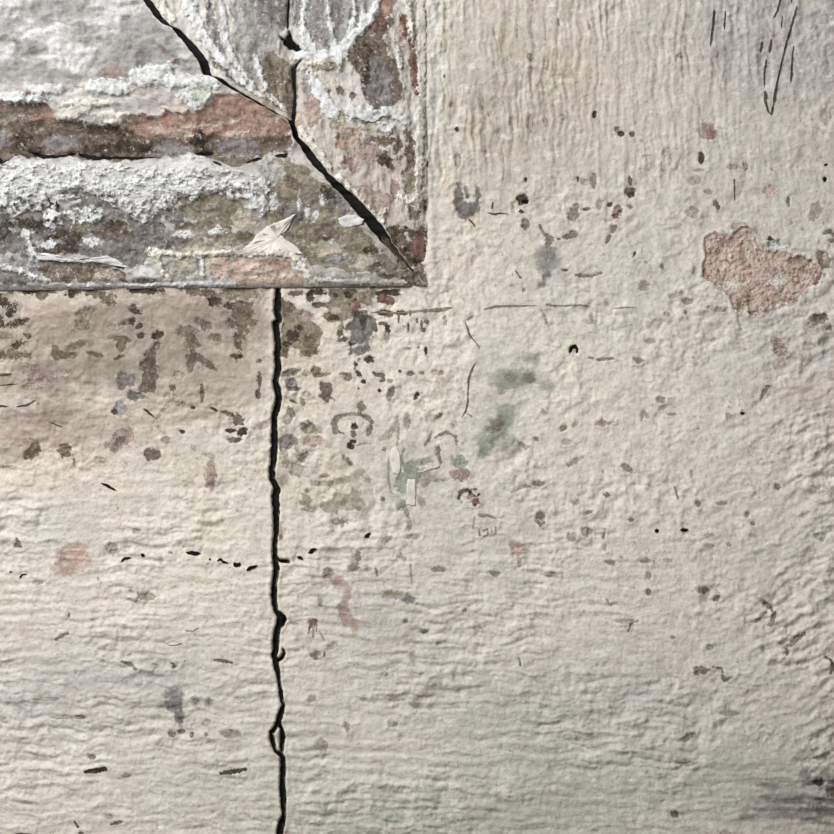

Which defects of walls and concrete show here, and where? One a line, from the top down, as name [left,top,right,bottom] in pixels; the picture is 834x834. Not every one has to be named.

crack [31,152,155,160]
peeling [0,0,496,540]
crack [143,0,415,274]
flaking render [692,222,834,315]
spalling [106,542,119,556]
crack [186,288,316,834]